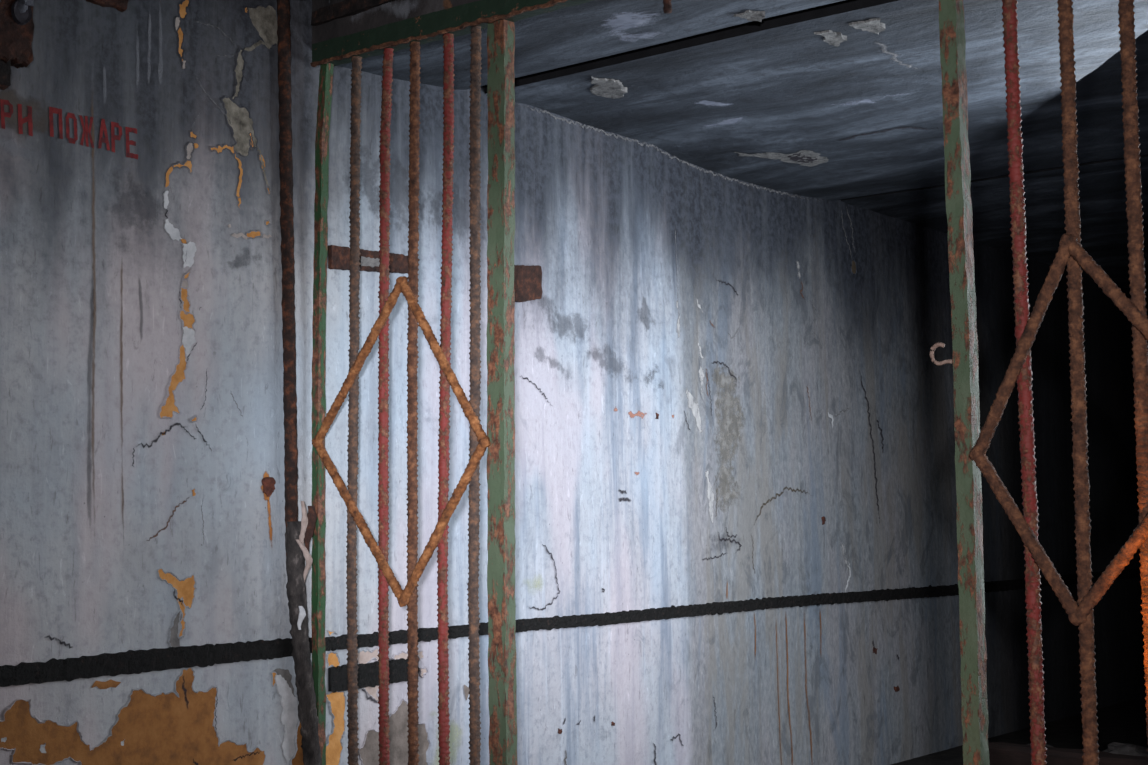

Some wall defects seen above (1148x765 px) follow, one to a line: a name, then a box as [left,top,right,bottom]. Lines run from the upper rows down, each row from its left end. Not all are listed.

peeling [734,10,765,22]
peeling [814,18,885,47]
peeling [590,77,627,99]
spalling [734,150,829,167]
flaking render [158,0,278,423]
crack [132,423,212,467]
crack [147,489,204,541]
rust [261,472,276,540]
crack [752,487,808,570]
peeling [157,568,197,647]
crack [529,544,560,610]
peeling [0,667,266,765]